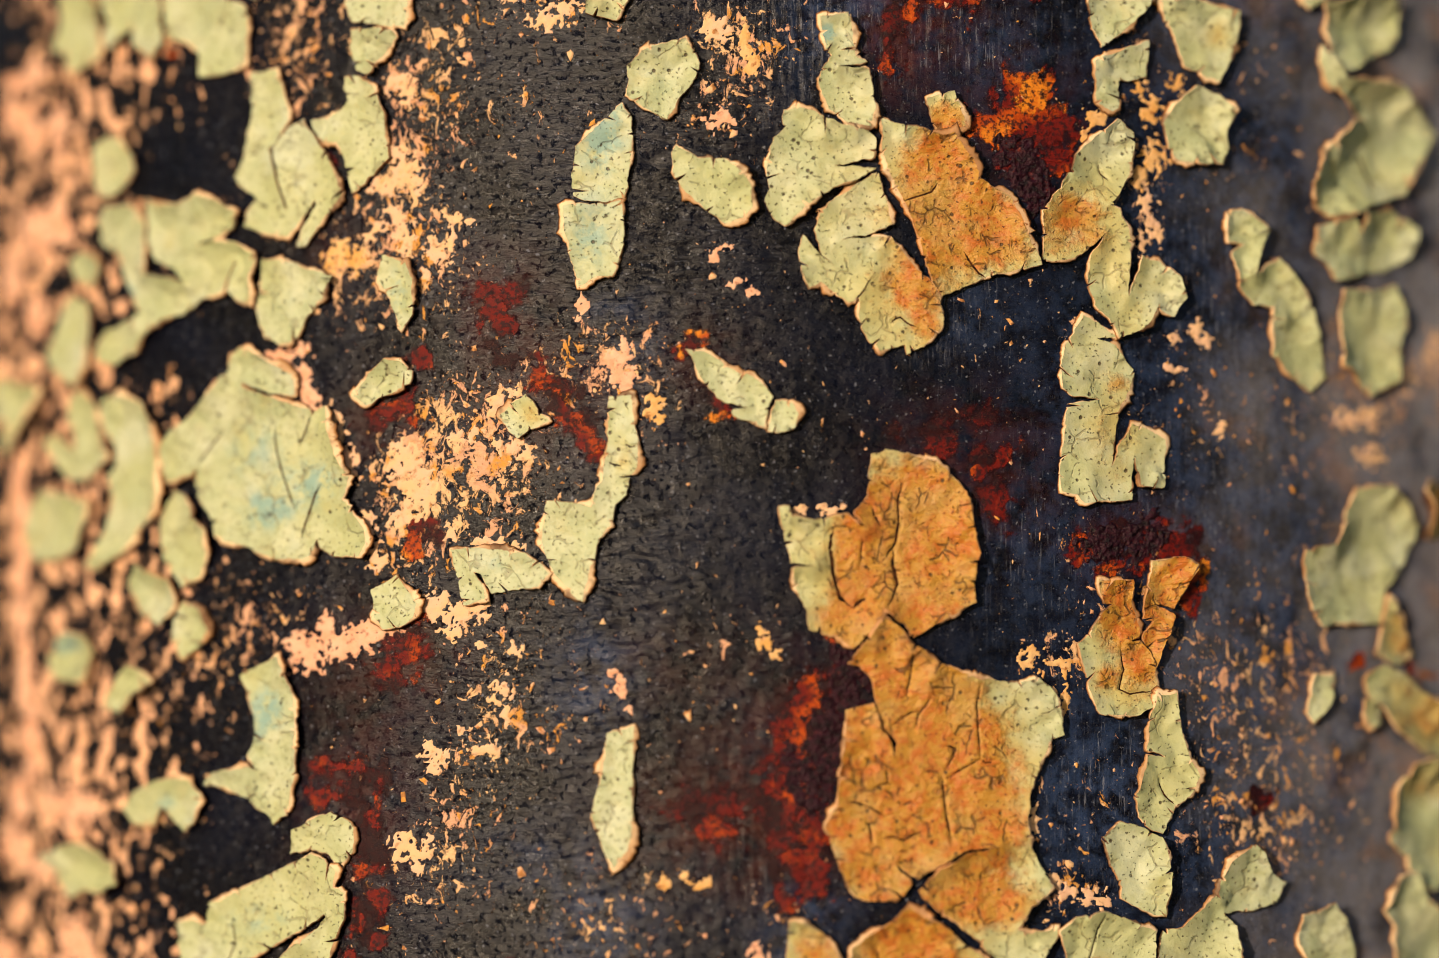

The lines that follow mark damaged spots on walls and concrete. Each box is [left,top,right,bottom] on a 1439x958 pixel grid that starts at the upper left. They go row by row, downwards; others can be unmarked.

peeling [23,0,426,662]
rust [460,277,606,463]
crack [905,184,937,201]
peeling [670,0,1241,507]
crack [964,252,986,278]
rust [965,62,1085,220]
rust [1064,507,1210,624]
peeling [123,651,360,958]
rust [652,635,873,914]
crack [894,649,930,726]
crack [848,687,991,843]
peeling [778,449,1287,958]